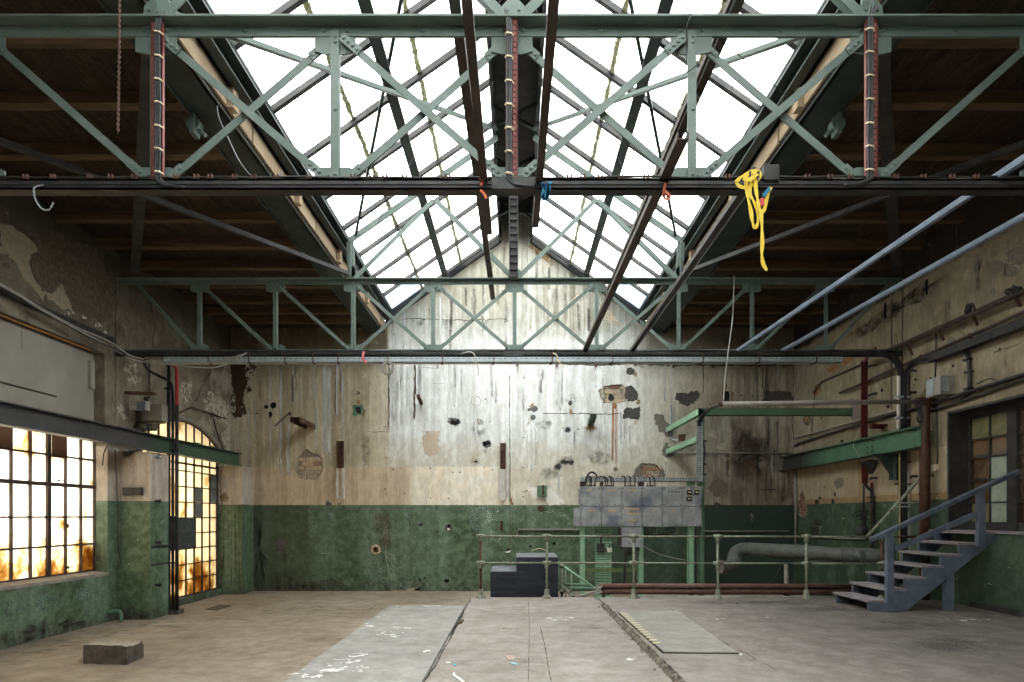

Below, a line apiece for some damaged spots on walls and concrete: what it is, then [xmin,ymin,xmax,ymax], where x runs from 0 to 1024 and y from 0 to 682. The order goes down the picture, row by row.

flaking render [0,223,73,311]
damp [439,297,453,349]
flaking render [598,384,626,403]
flaking render [295,448,324,479]
flaking render [640,463,662,477]
damp [713,416,785,501]